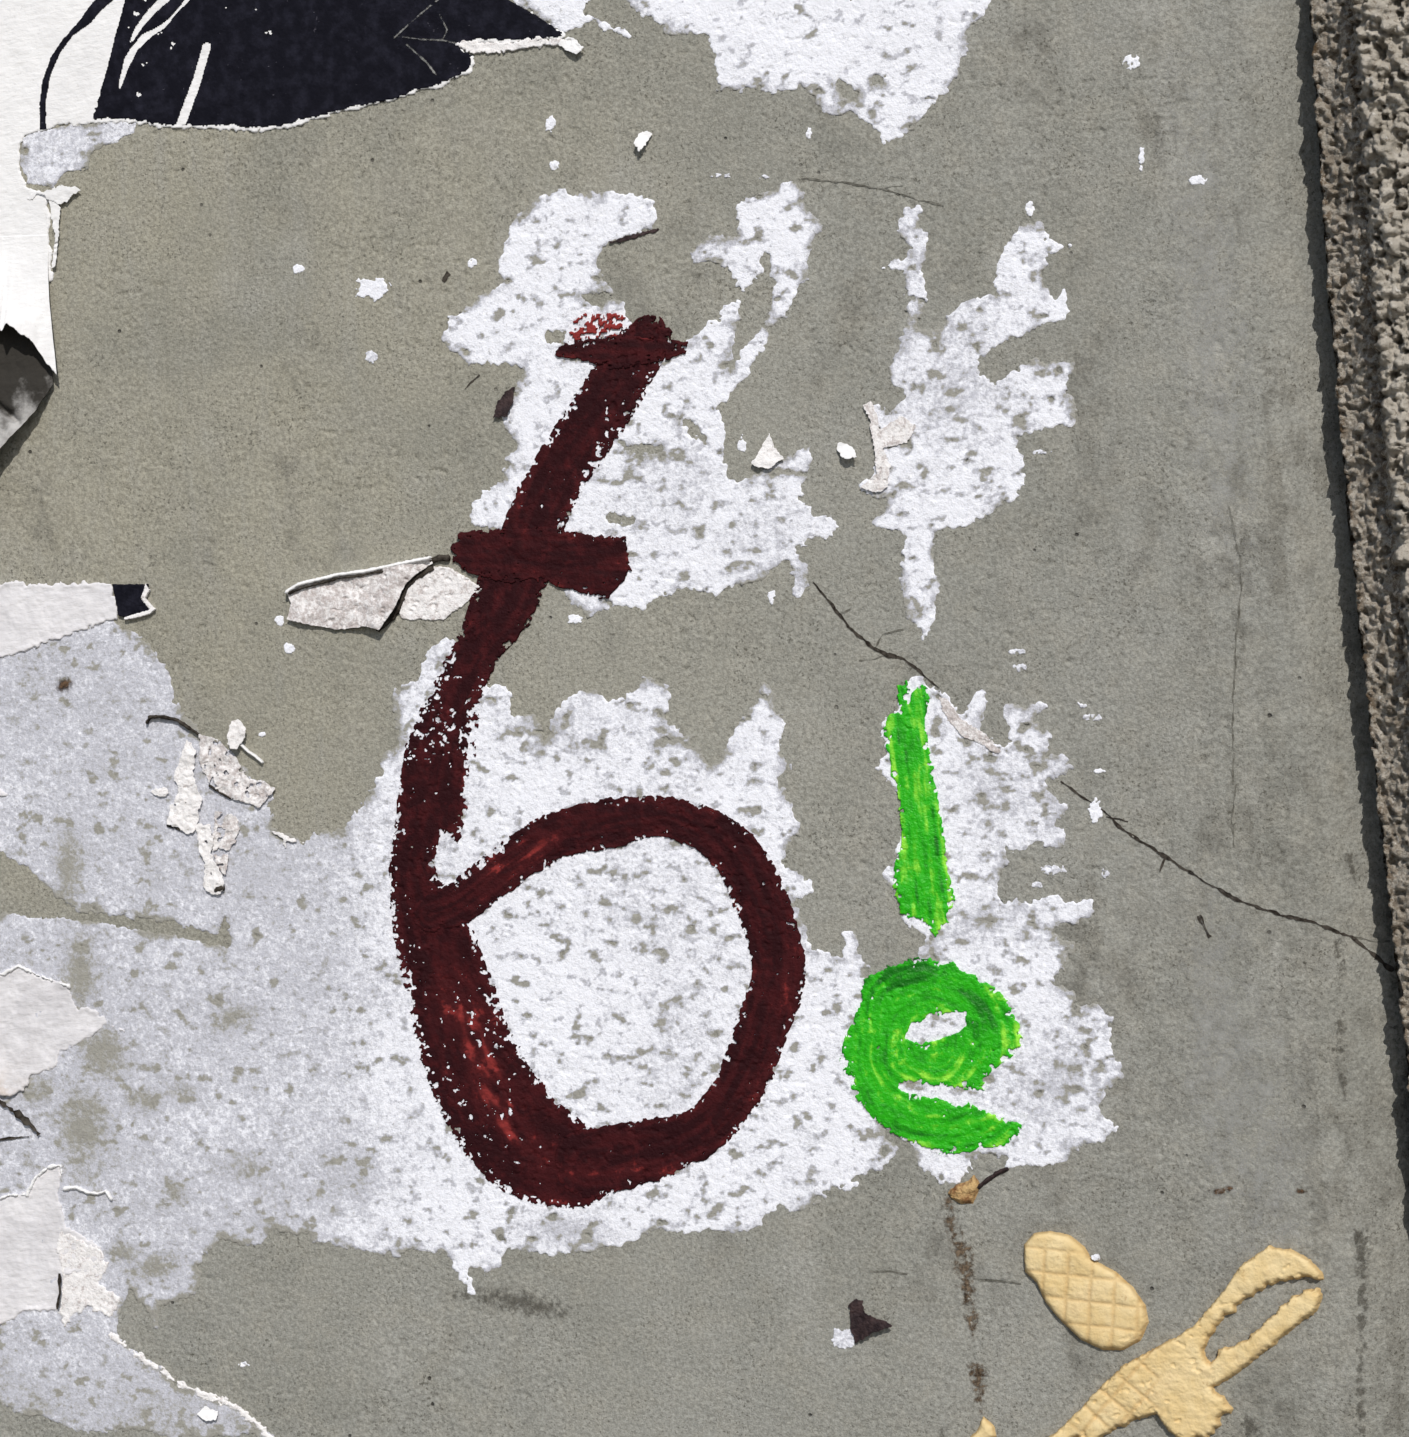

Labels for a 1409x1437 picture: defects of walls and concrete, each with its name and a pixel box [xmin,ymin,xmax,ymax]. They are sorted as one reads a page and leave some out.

peeling [513,0,631,54]
peeling [634,131,652,152]
peeling [624,0,991,145]
peeling [441,188,659,530]
peeling [549,181,836,619]
peeling [837,442,857,459]
peeling [859,205,1077,641]
peeling [285,554,482,632]
crack [813,582,939,688]
crack [1228,506,1242,847]
crack [1060,781,1395,972]
peeling [0,621,1124,1437]